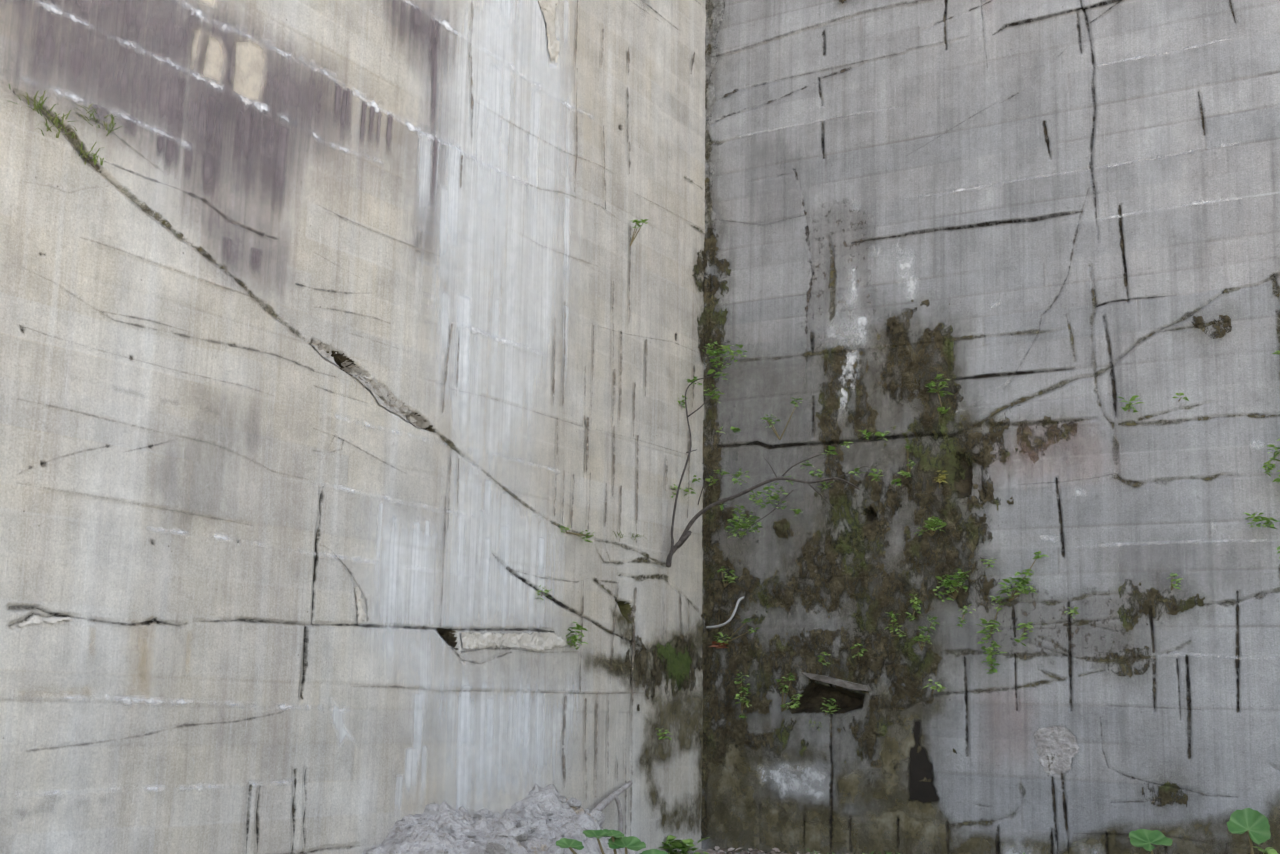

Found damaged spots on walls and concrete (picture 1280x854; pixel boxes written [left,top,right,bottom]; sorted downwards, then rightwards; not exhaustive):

crack [37,106,329,391]
leakage [16,0,571,451]
crack [212,0,1280,814]
leakage [727,210,959,820]
spalling [10,615,72,629]
crack [11,606,177,626]
spalling [437,628,568,652]
leakage [988,591,1132,664]
spalling [788,683,864,714]
crack [948,792,1025,827]